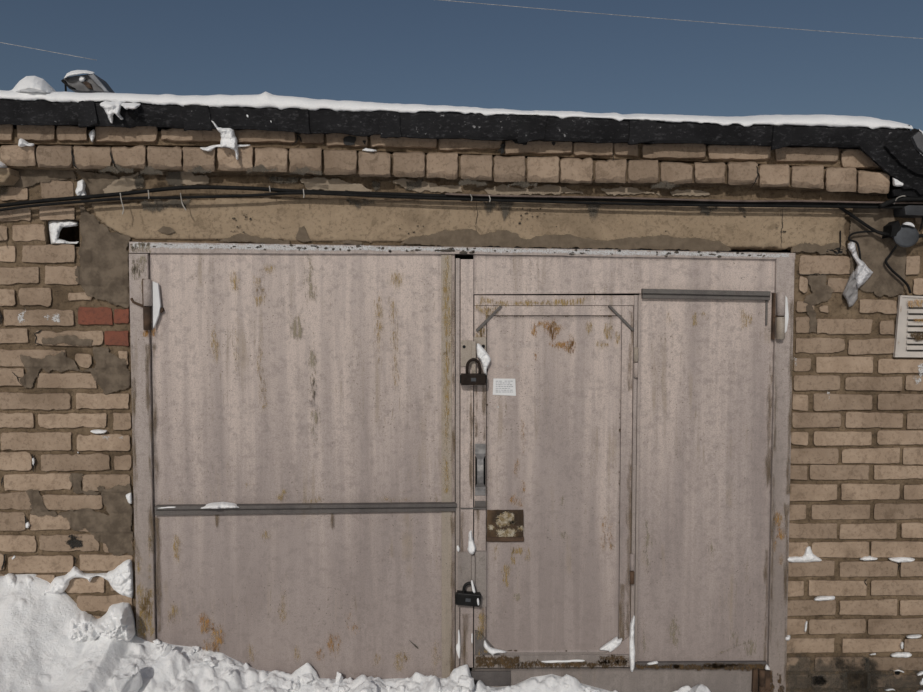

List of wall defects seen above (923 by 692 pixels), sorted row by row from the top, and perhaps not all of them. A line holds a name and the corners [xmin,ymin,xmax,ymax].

peeling [175,166,211,186]
peeling [293,167,372,192]
peeling [393,178,583,195]
peeling [601,186,710,196]
spalling [127,208,847,285]
rust [476,297,584,337]
rust [531,316,574,353]
rust [451,630,786,692]
damp [786,657,923,692]